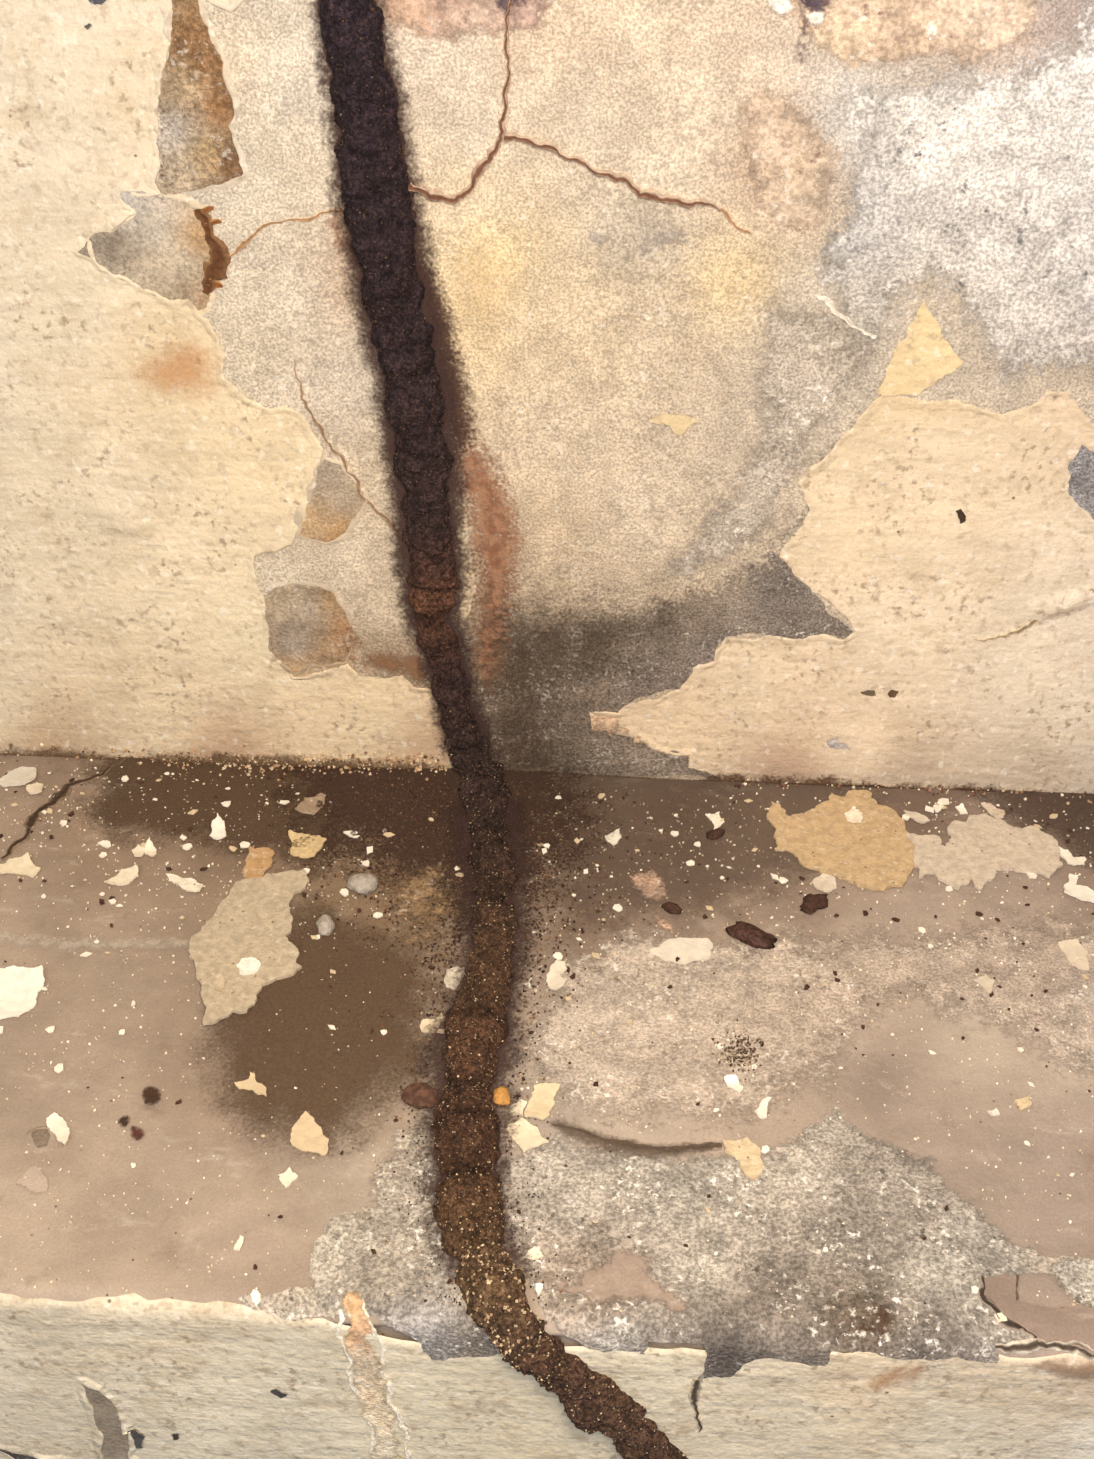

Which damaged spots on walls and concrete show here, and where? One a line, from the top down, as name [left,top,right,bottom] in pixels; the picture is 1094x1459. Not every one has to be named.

crack [408,0,751,234]
damp [799,0,830,61]
peeling [71,0,432,694]
rust [426,267,524,689]
peeling [376,0,1094,811]
rust [348,627,424,680]
crack [1,757,127,861]
damp [81,757,349,881]
damp [209,904,435,1150]
spalling [237,1108,501,1361]
crack [550,1123,722,1156]
spalling [500,1081,1094,1380]